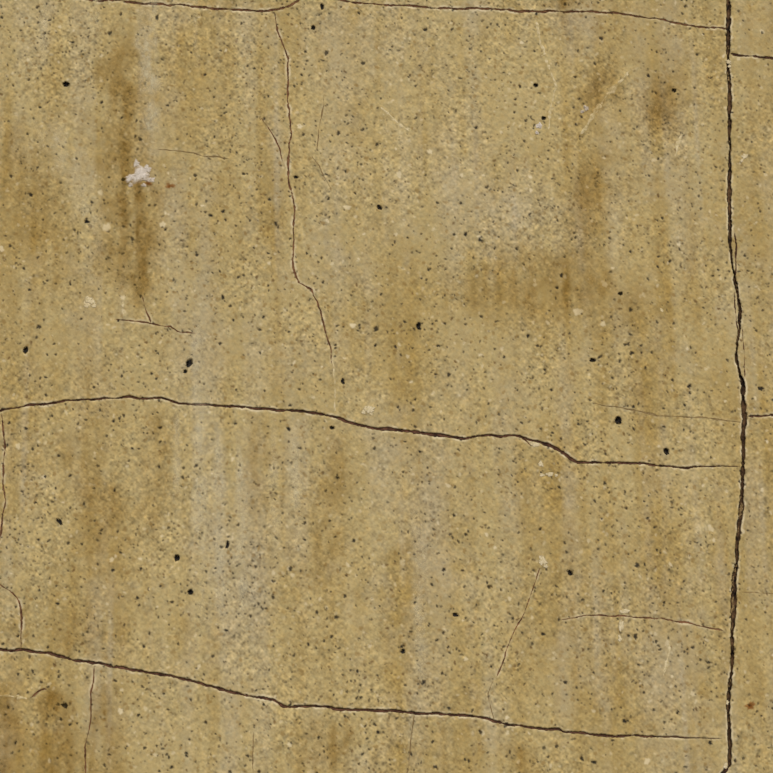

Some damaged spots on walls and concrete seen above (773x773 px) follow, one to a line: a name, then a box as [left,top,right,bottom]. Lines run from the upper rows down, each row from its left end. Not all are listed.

crack [89,0,332,363]
crack [0,396,720,536]
crack [340,0,773,773]
crack [0,569,700,773]